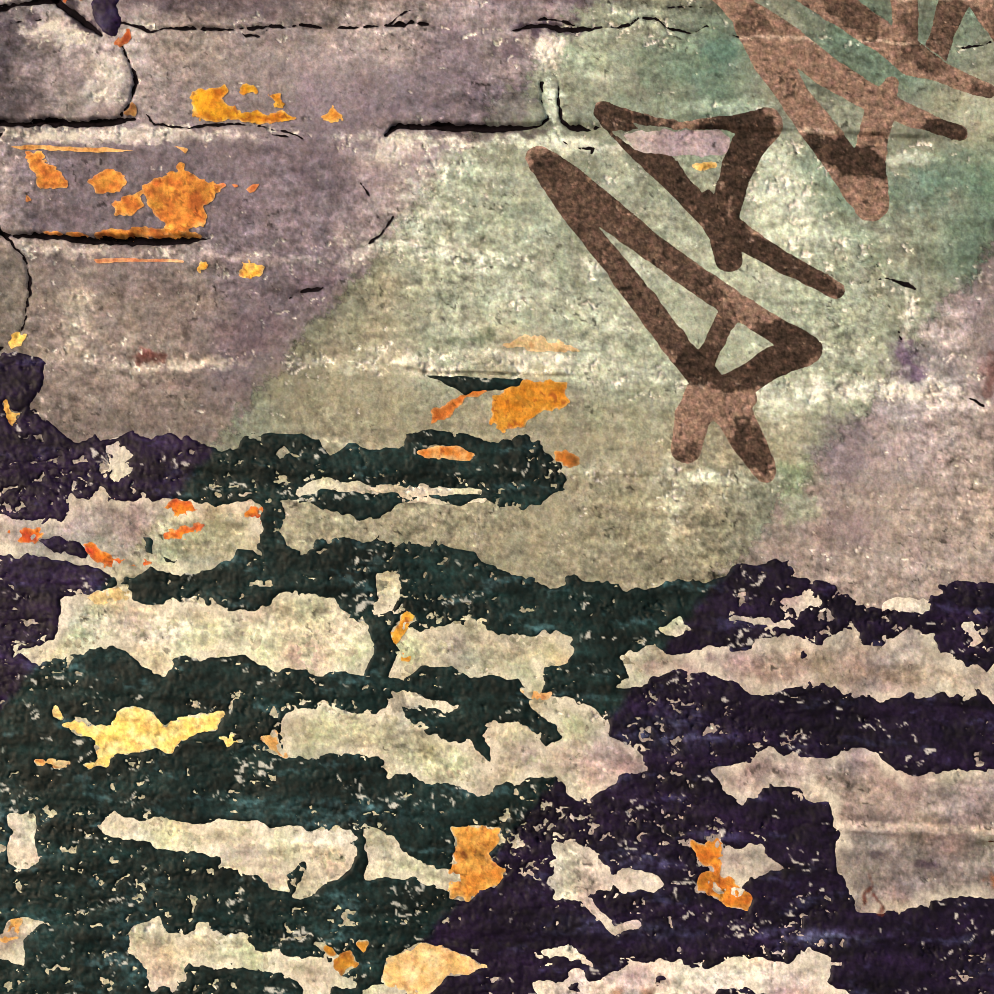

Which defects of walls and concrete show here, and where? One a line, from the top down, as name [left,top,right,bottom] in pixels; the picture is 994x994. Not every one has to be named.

peeling [91,0,131,47]
crack [512,6,739,38]
crack [0,0,429,139]
crack [384,81,600,154]
crack [365,216,394,246]
crack [0,228,207,331]
crack [289,287,324,299]
peeling [0,332,994,994]